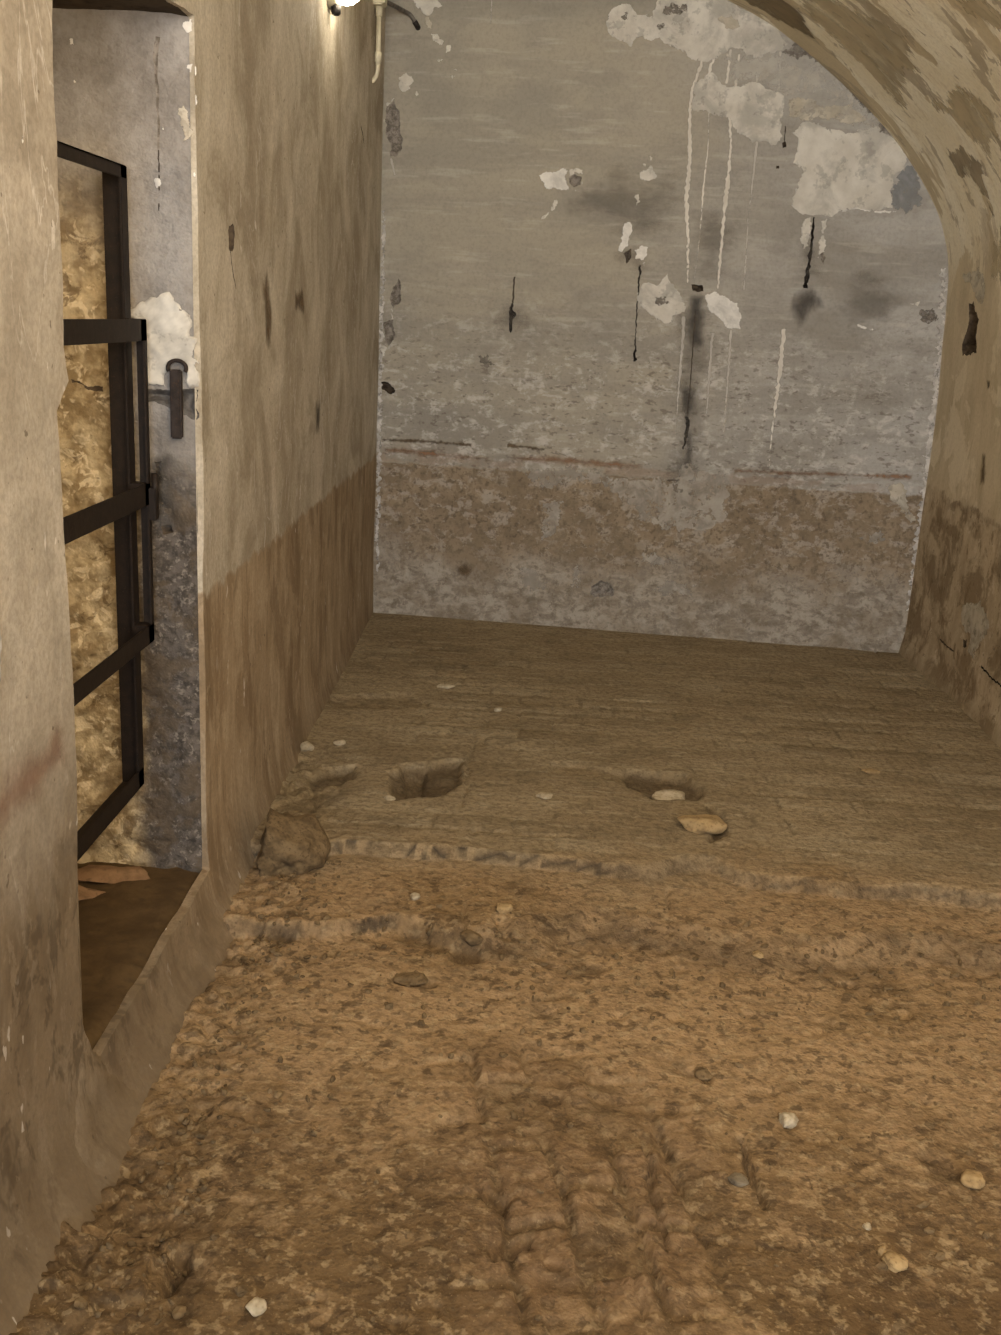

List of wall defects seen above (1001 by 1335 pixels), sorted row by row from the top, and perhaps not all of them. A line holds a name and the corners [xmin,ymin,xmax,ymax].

peeling [958,0,1001,30]
peeling [539,168,583,219]
damp [684,49,740,289]
peeling [606,0,921,258]
peeling [131,292,200,389]
peeling [618,222,704,361]
damp [668,298,733,493]
crack [940,639,1001,687]